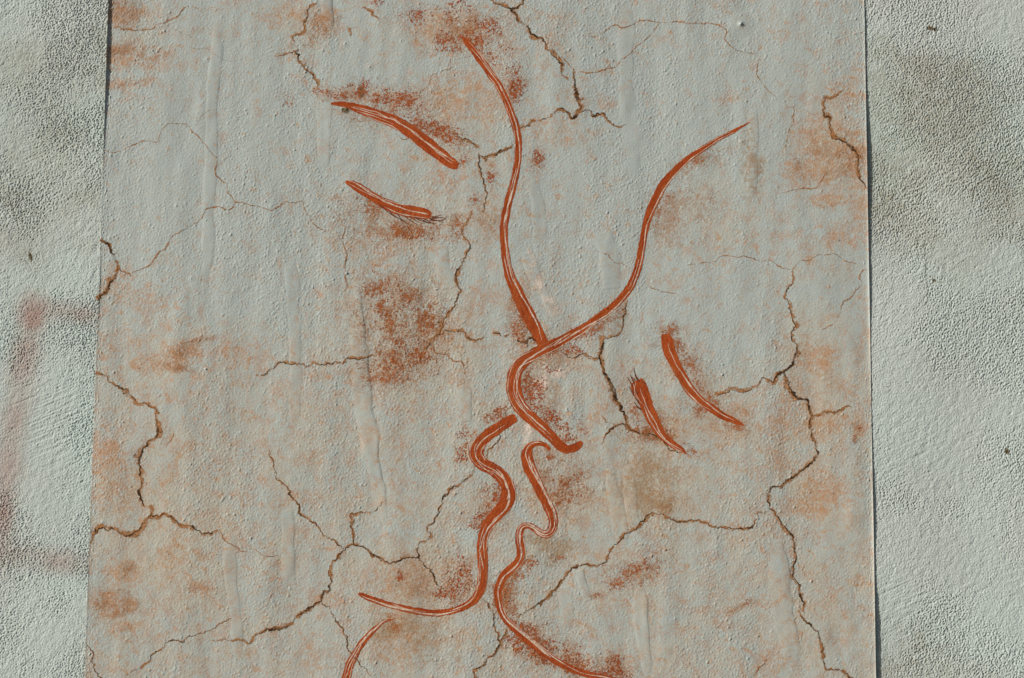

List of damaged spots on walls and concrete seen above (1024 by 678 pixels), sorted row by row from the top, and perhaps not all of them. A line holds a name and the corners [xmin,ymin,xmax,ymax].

crack [109,6,189,31]
crack [279,3,320,90]
crack [348,7,379,36]
crack [95,102,347,301]
crack [424,0,867,374]
crack [256,354,374,376]
crack [90,371,277,557]
crack [127,407,511,676]
crack [472,253,864,678]